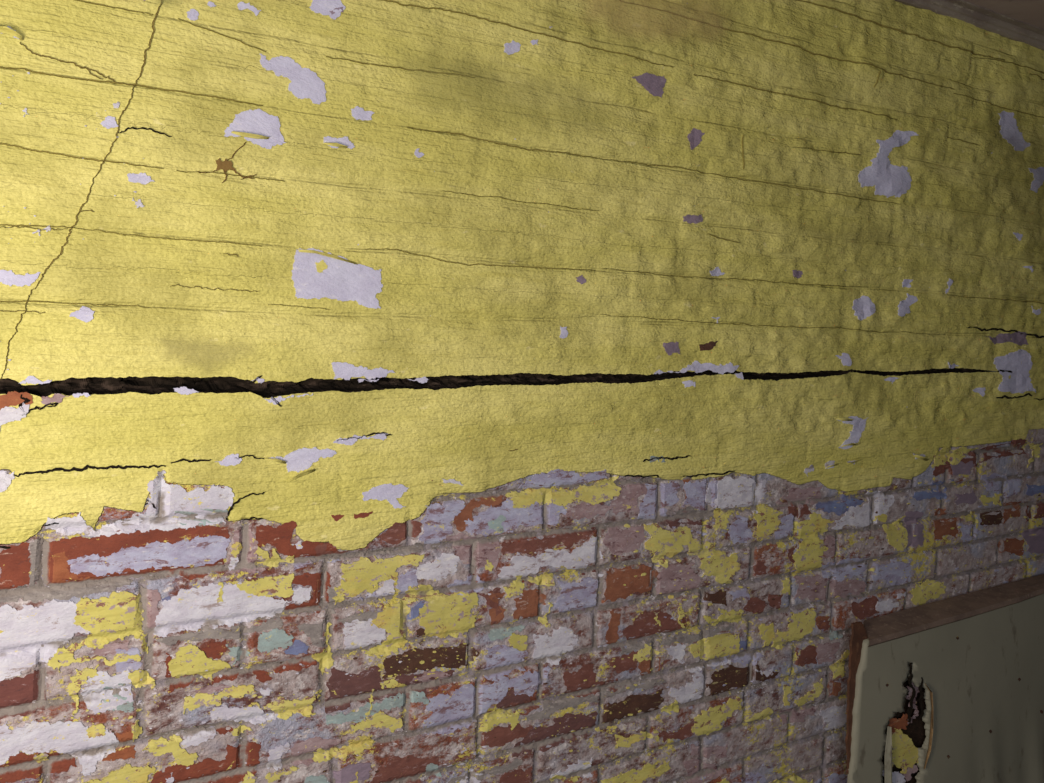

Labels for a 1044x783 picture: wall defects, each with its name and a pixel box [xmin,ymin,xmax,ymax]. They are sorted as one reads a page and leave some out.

peeling [260,54,326,104]
peeling [224,109,286,149]
peeling [998,111,1030,151]
peeling [858,130,918,198]
crack [0,0,1044,416]
peeling [291,248,383,309]
peeling [331,362,395,380]
peeling [973,331,1036,397]
spalling [0,391,69,426]
crack [13,455,264,477]
crack [226,492,265,521]
peeling [0,416,1044,783]